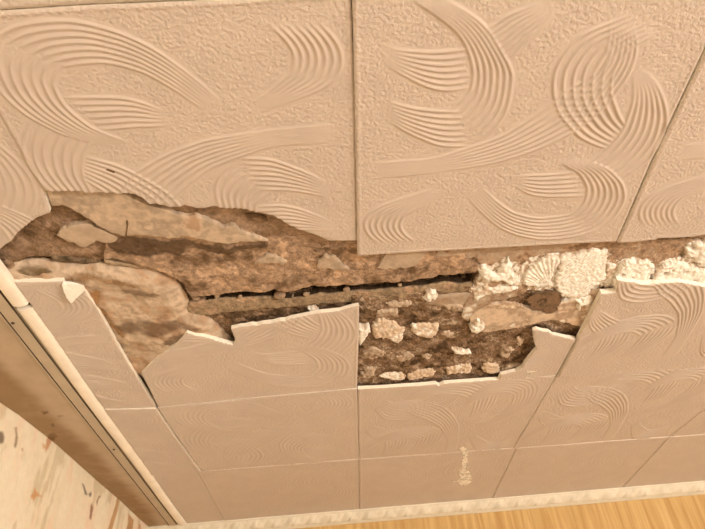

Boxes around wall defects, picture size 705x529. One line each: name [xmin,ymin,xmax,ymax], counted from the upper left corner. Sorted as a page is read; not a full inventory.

leakage [109,236,268,258]
leakage [18,268,51,276]
crack [28,254,147,269]
crack [181,273,473,301]
spalling [0,191,705,399]